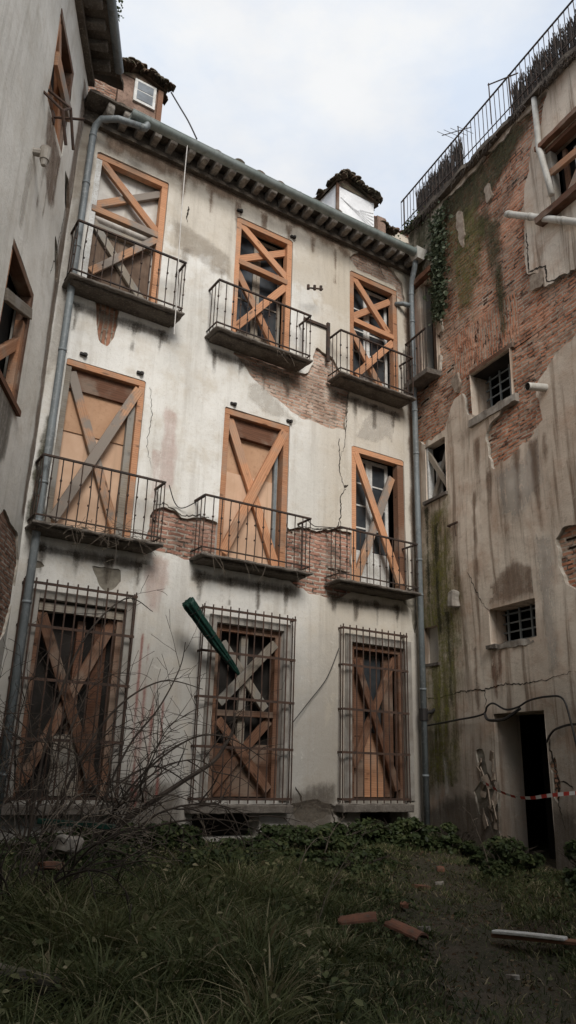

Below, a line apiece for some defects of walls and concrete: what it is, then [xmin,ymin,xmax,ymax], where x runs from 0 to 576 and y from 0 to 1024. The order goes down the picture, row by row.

flaking render [417,92,576,469]
flaking render [95,302,119,346]
flaking render [234,348,350,430]
crack [299,394,348,531]
flaking render [0,509,44,640]
flaking render [145,507,218,560]
flaking render [287,527,351,598]
flaking render [556,524,576,589]
crack [428,671,571,707]
flaking render [474,749,502,834]